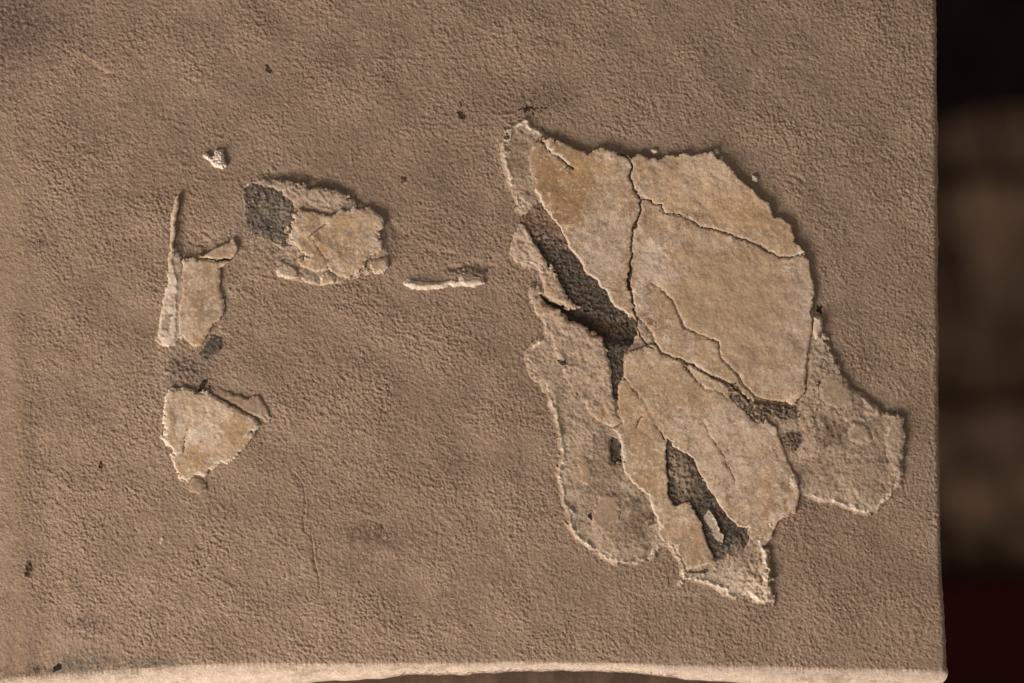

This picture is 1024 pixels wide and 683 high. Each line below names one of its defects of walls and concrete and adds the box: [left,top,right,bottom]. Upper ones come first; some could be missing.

flaking render [155,195,238,361]
flaking render [160,379,271,494]
flaking render [242,178,390,286]
crack [623,378,665,440]
flaking render [499,116,907,607]
crack [620,154,826,406]